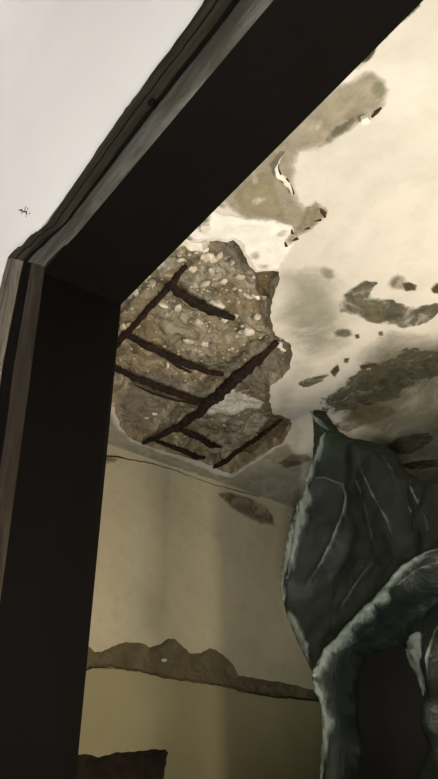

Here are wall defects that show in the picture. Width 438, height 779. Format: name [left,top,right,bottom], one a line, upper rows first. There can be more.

peeling [225,74,384,247]
water stain [187,211,297,272]
water stain [342,281,438,336]
spalling [111,223,293,474]
water stain [298,358,349,388]
water stain [320,347,438,469]
peeling [220,493,273,524]
flaking render [86,639,319,702]